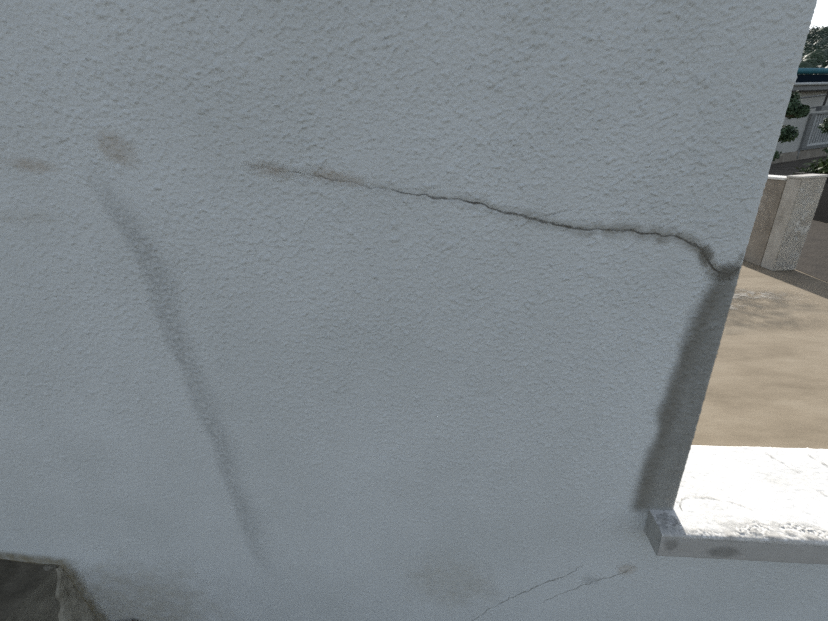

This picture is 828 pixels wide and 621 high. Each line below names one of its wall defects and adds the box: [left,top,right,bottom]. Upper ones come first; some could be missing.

crack [400,192,592,230]
crack [634,230,736,277]